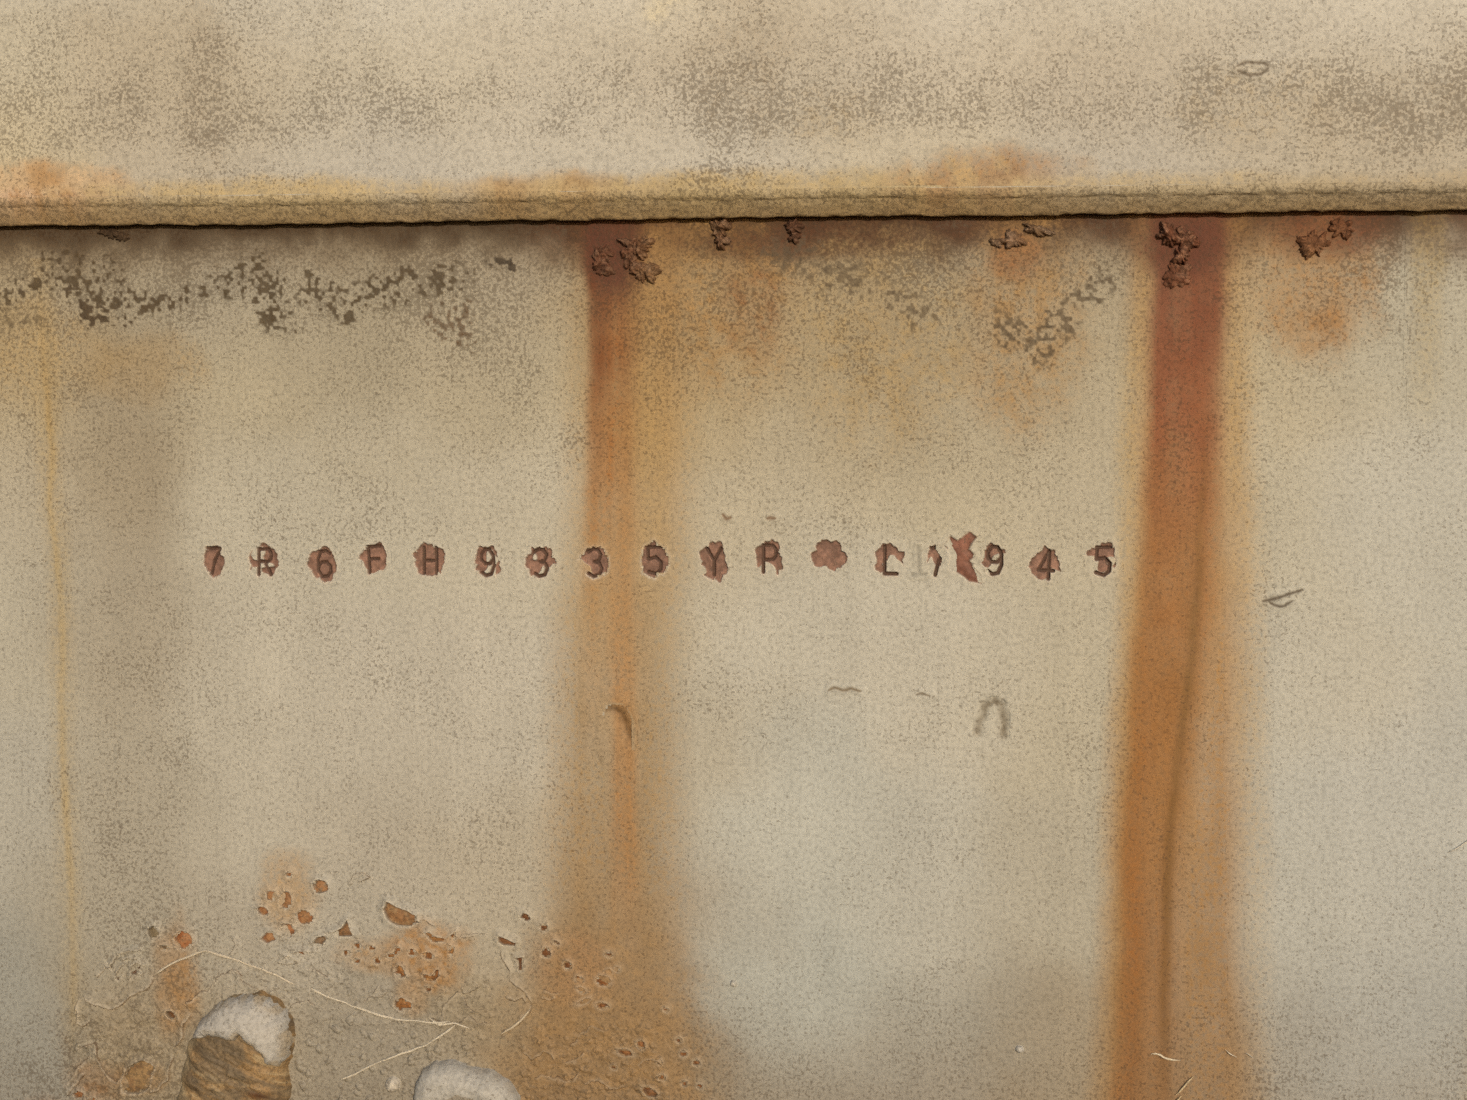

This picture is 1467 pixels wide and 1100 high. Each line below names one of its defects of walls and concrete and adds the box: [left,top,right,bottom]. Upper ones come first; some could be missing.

mould [753,235,946,340]
mould [977,249,1136,379]
damp [0,240,523,1000]
corrosion [485,211,1403,1100]
peeling [61,918,243,1100]
peeling [248,865,462,1015]
peeling [492,906,626,1015]
peeling [607,1001,733,1100]